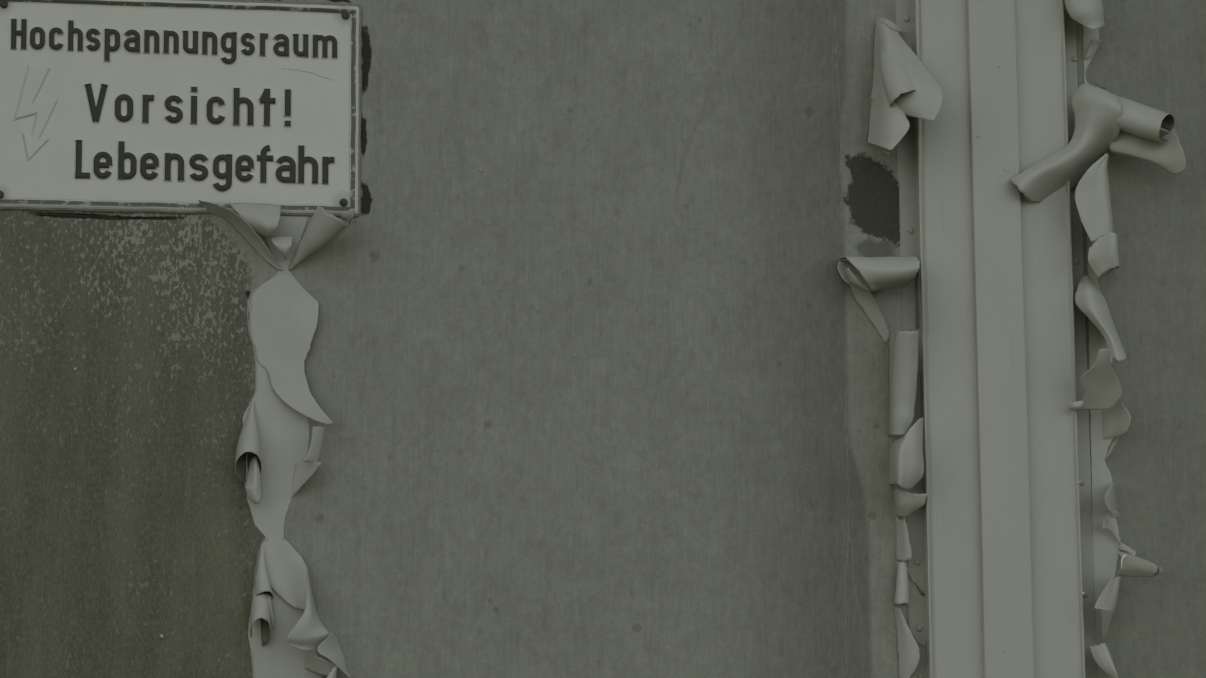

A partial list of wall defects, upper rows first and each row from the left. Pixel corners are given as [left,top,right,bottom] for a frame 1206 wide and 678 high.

peeling [866,17,943,155]
peeling [198,200,355,678]
peeling [837,256,928,678]
peeling [1010,0,1186,678]